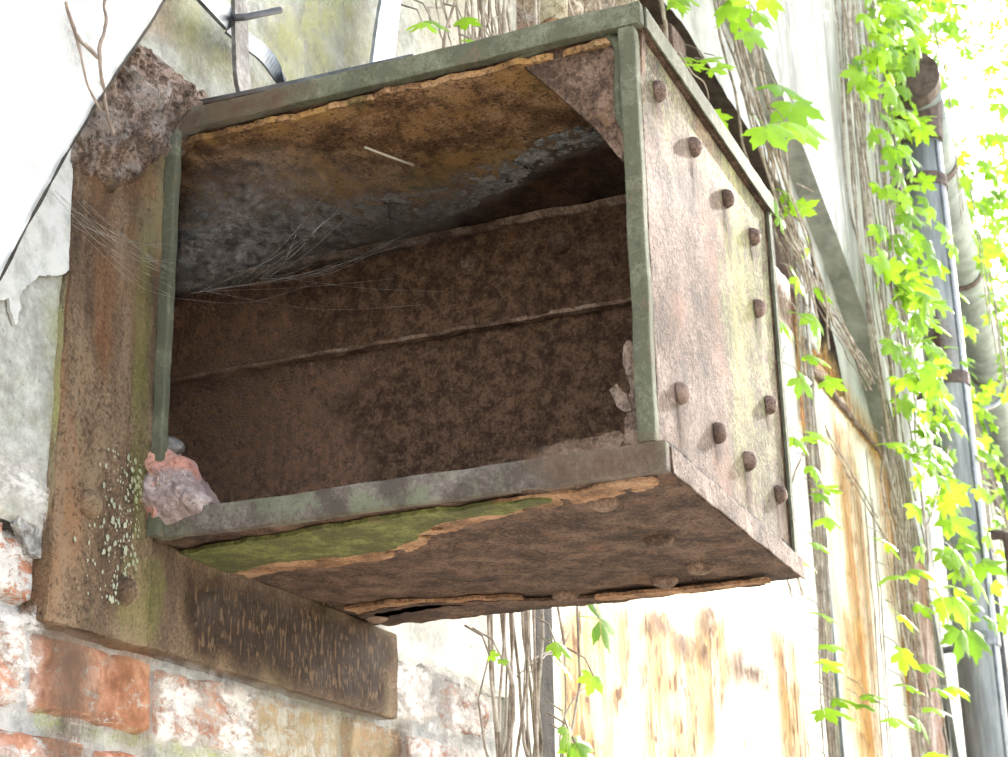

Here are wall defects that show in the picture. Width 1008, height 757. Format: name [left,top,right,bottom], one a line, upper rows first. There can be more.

peeling [0,147,73,325]
corrosion [928,323,949,357]
spalling [0,461,49,513]
spalling [10,515,42,559]
corrosion [234,476,659,579]
corrosion [776,276,901,757]
peeling [0,612,40,705]
water stain [36,629,98,757]
corrosion [188,577,810,757]